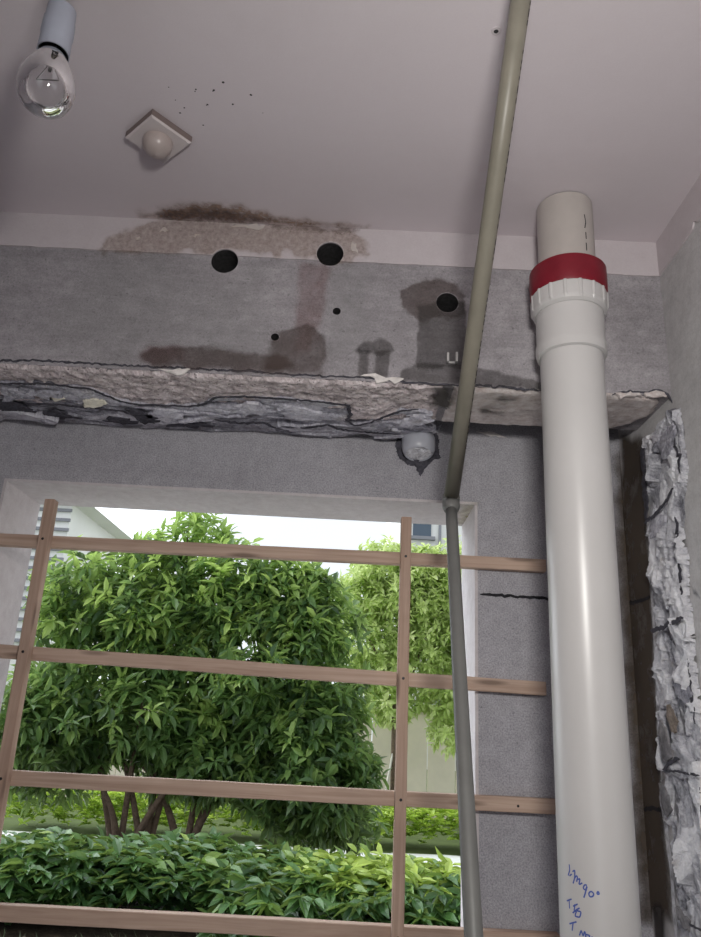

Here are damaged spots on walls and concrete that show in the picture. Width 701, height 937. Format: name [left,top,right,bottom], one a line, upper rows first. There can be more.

damp [403,281,456,318]
damp [145,328,321,372]
spalling [0,359,459,476]
spalling [470,383,542,438]
crack [480,593,548,601]
spalling [606,389,701,937]